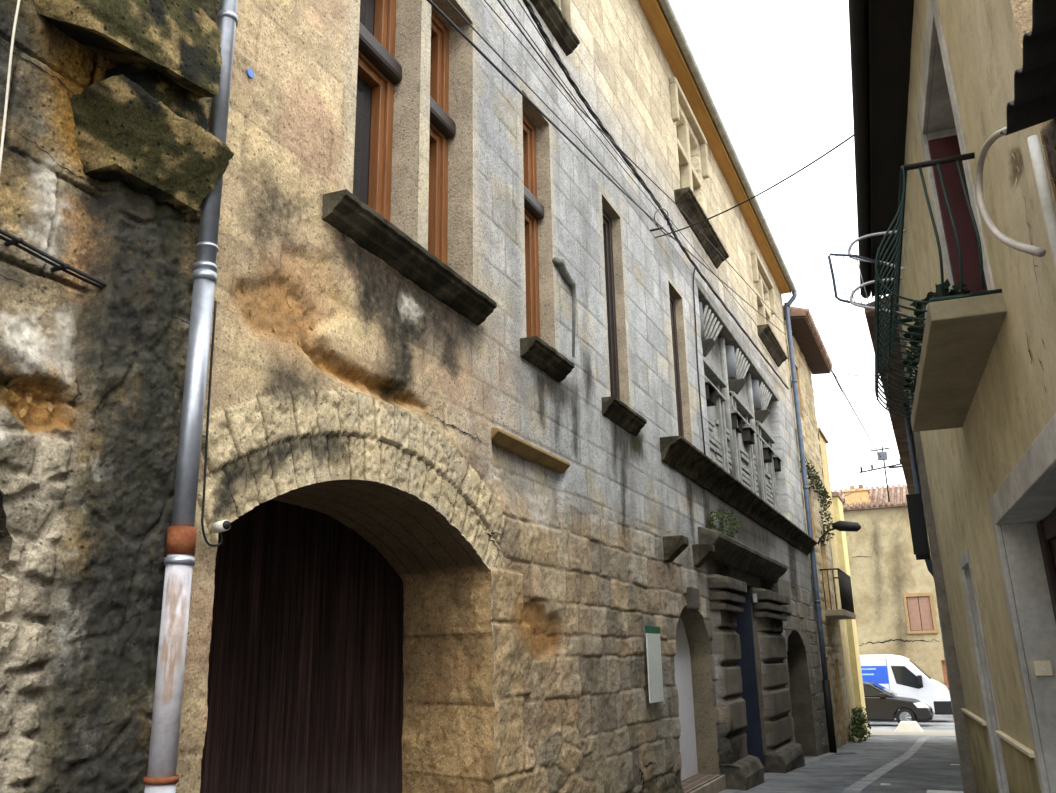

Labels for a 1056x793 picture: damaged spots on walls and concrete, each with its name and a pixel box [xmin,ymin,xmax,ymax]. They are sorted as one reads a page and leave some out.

peeling [29,159,63,255]
spalling [1,376,73,427]
peeling [2,314,74,368]
spalling [312,349,411,406]
damp [341,233,481,395]
damp [538,364,592,456]
damp [614,423,642,528]